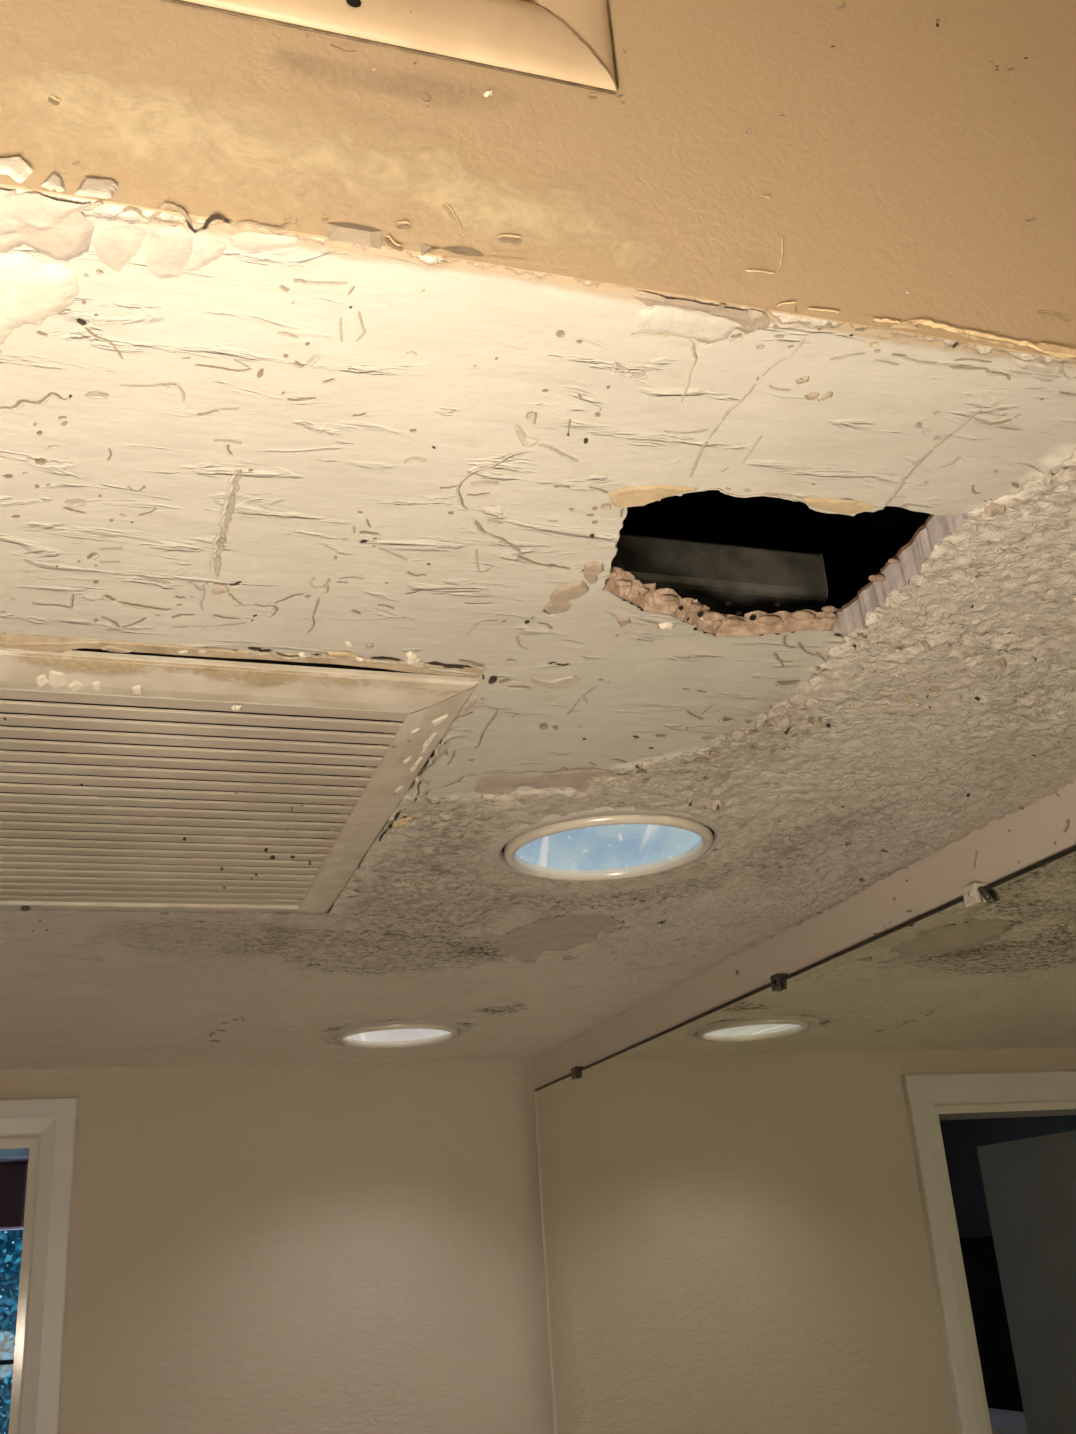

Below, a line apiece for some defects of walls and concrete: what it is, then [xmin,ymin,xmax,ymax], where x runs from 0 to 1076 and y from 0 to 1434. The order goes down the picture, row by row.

flaking render [0,156,118,199]
crack [902,356,1076,379]
crack [666,339,805,477]
crack [0,270,578,674]
crack [886,410,1076,505]
peeling [0,204,1076,802]
crack [773,634,892,702]
crack [876,641,909,649]
crack [973,631,1034,654]
spalling [379,811,418,842]
peeling [498,913,628,964]